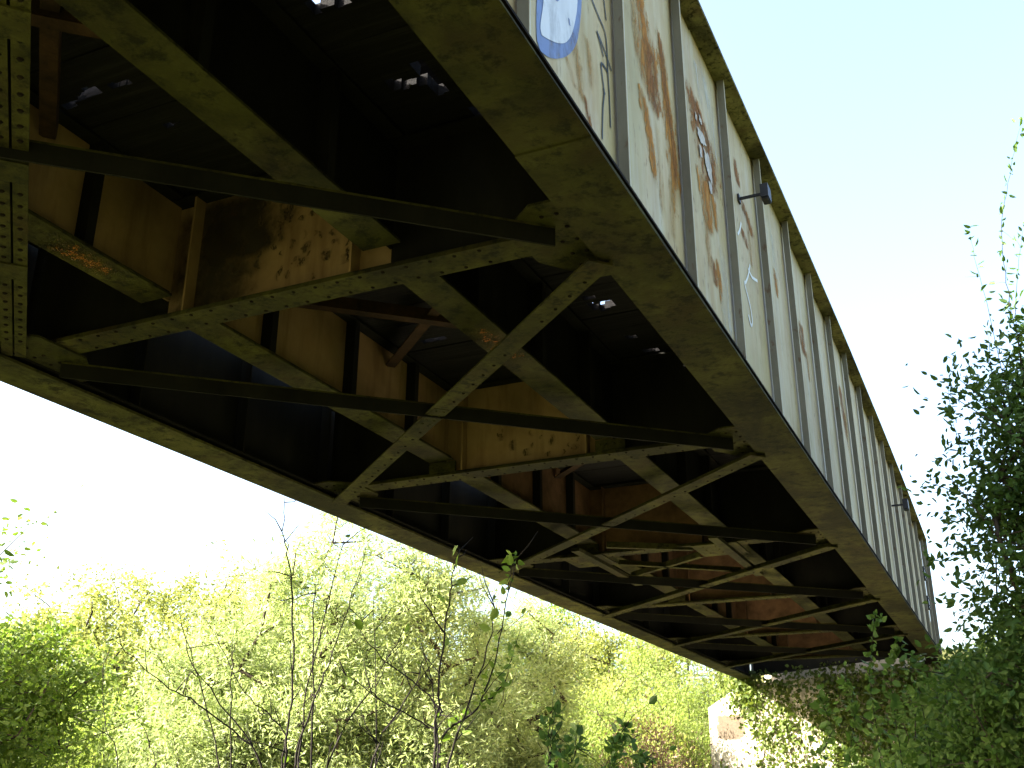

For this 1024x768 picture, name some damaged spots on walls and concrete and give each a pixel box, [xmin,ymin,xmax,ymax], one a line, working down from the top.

corrosion [632,0,681,231]
corrosion [712,259,723,299]